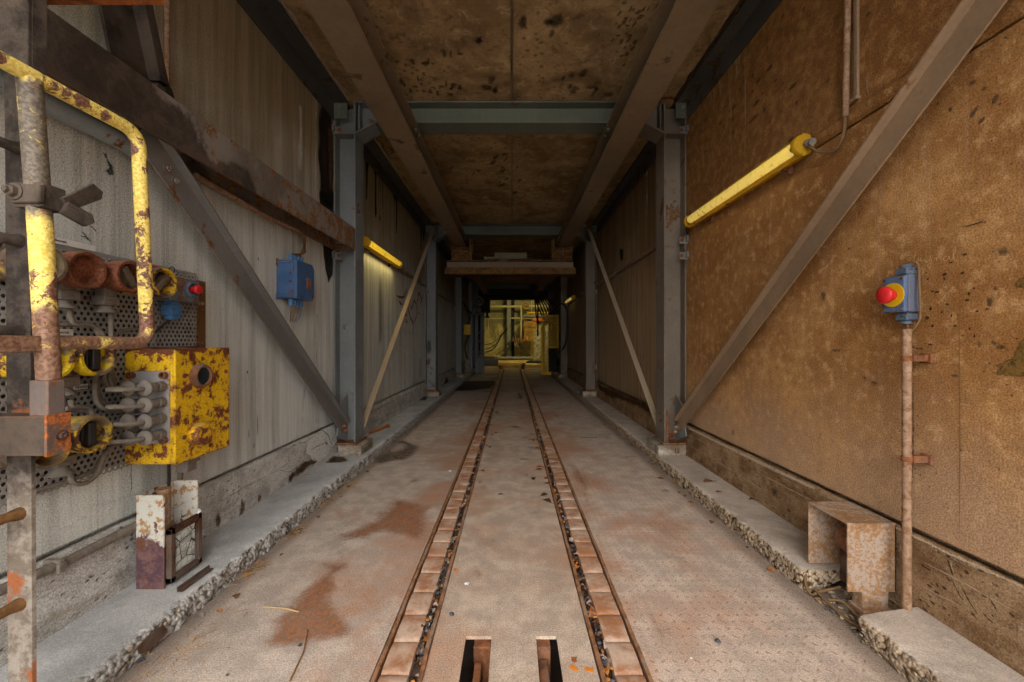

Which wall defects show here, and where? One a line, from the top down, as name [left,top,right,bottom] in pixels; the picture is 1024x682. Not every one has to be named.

leakage [314,100,334,213]
leakage [323,245,334,282]
corrosion [348,502,424,537]
corrosion [273,565,345,643]